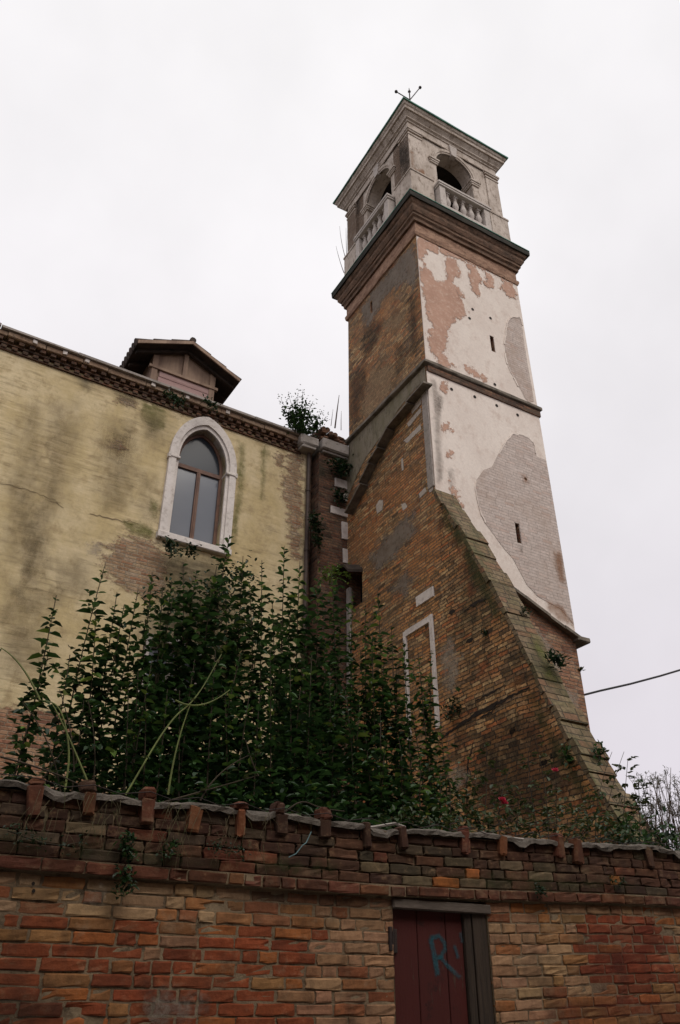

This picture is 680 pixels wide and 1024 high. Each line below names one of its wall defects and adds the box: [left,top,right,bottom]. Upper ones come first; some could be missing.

peeling [346,237,519,498]
peeling [504,316,534,402]
peeling [99,532,174,601]
peeling [273,449,305,561]
peeling [448,433,574,624]